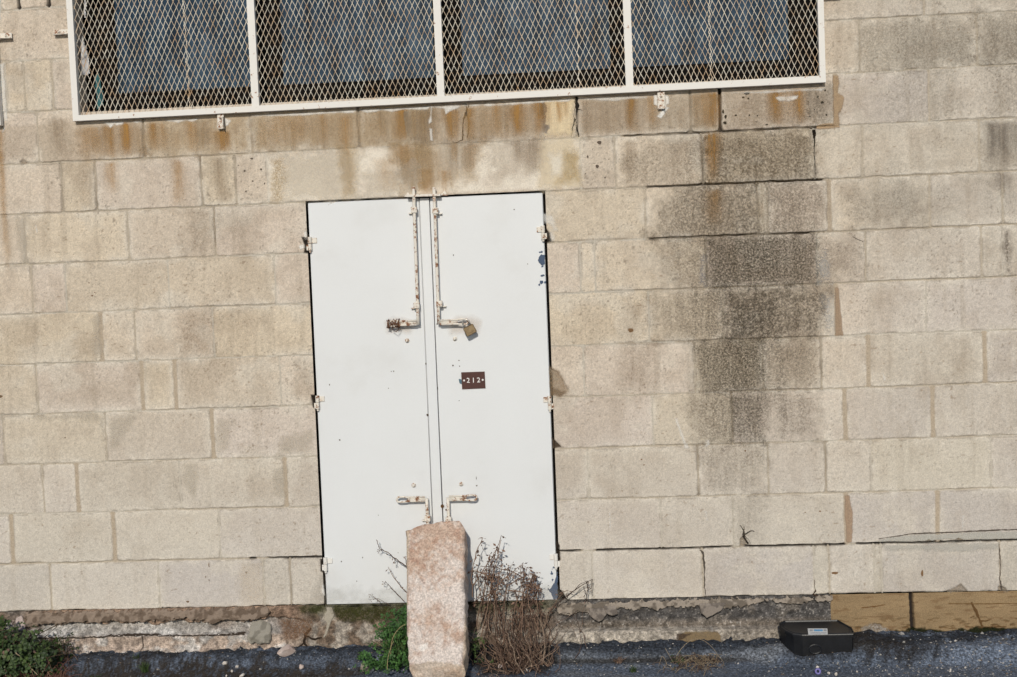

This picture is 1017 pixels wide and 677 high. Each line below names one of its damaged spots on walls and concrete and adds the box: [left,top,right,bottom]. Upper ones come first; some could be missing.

damp [699,238,831,388]
crack [740,525,755,546]
flaking render [16,601,270,631]
spalling [677,631,721,642]